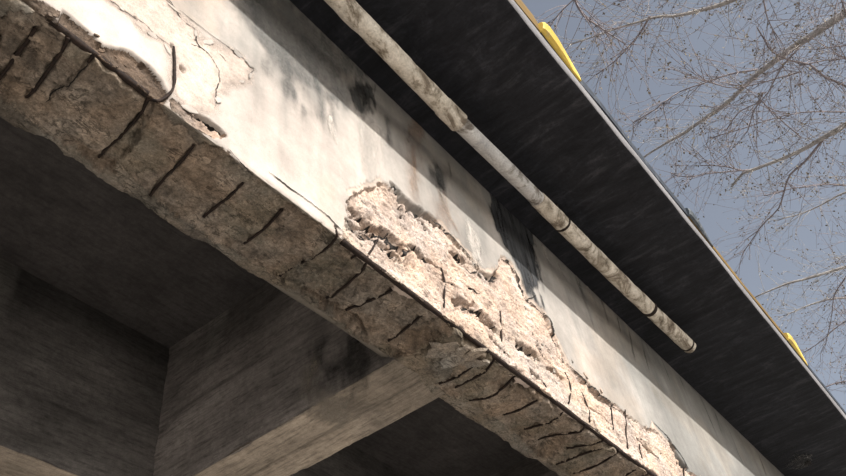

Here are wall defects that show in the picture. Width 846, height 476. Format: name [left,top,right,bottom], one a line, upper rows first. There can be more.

spalling [0,0,339,276]
damp [243,0,376,136]
spalling [283,182,686,476]